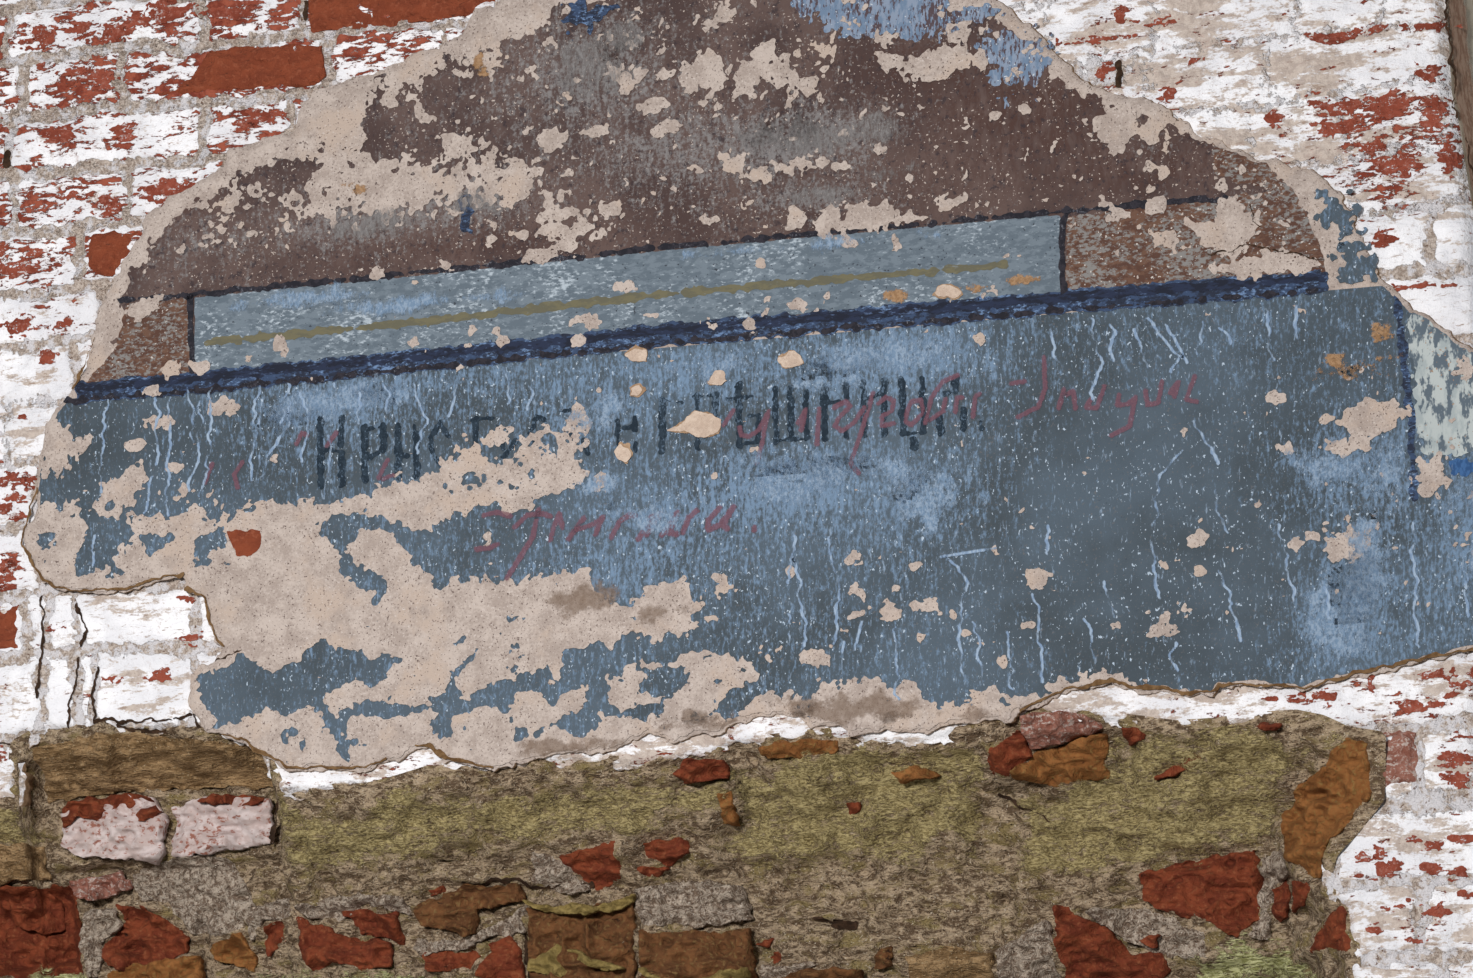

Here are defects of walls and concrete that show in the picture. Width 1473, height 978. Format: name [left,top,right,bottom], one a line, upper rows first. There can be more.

peeling [10,0,1179,276]
peeling [1067,86,1333,281]
peeling [1303,0,1473,190]
peeling [0,244,45,279]
peeling [0,313,78,365]
peeling [123,294,164,322]
peeling [142,360,210,397]
peeling [1318,367,1412,459]
peeling [1371,228,1399,248]
peeling [1391,281,1458,292]
crack [20,487,493,844]
spalling [0,395,1473,978]